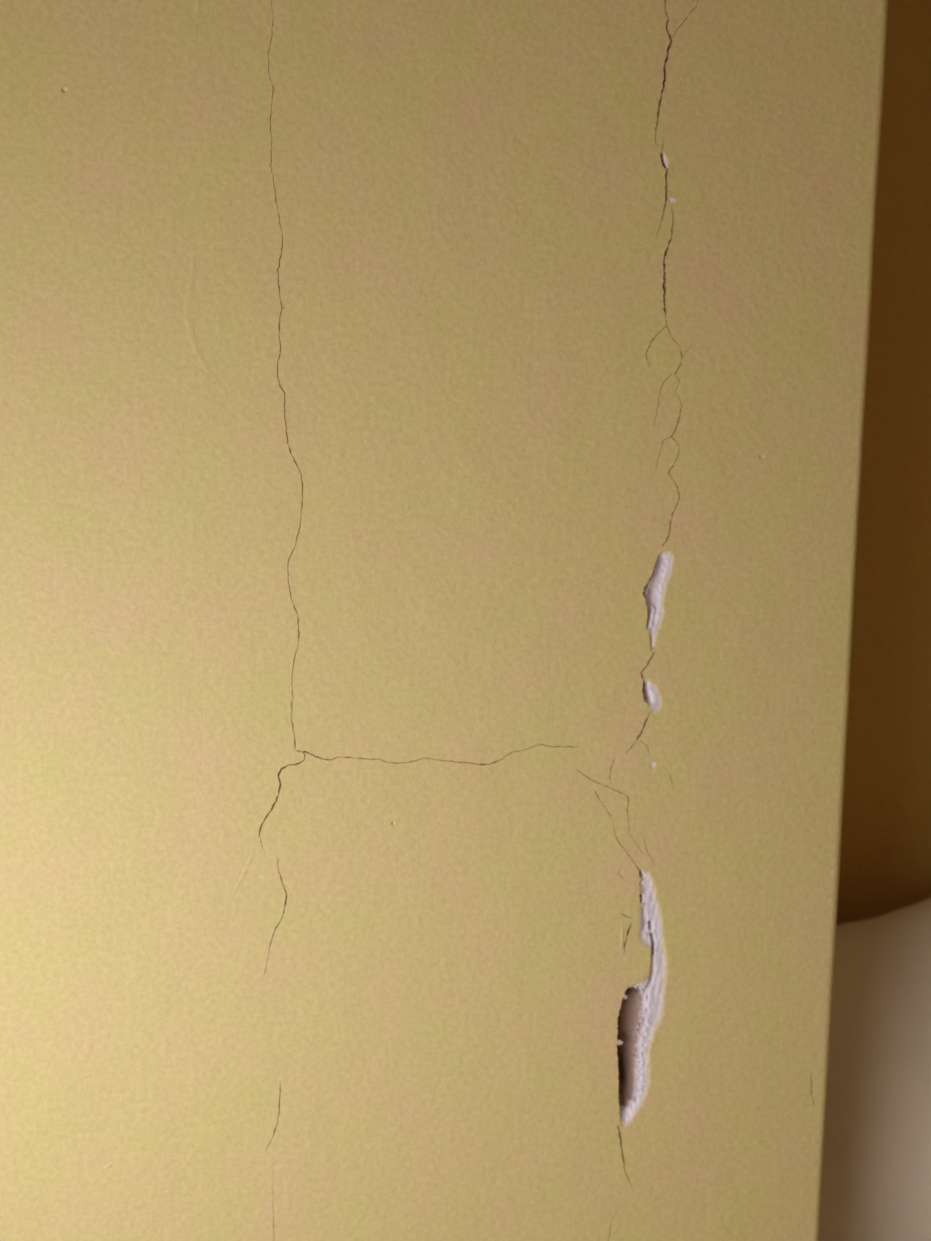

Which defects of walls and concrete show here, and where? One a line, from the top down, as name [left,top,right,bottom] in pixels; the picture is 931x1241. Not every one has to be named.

crack [646,0,698,546]
crack [259,0,674,981]
flaking render [642,550,675,652]
flaking render [642,678,663,715]
flaking render [617,869,669,1129]
crack [266,1082,281,1240]
crack [608,1125,634,1241]